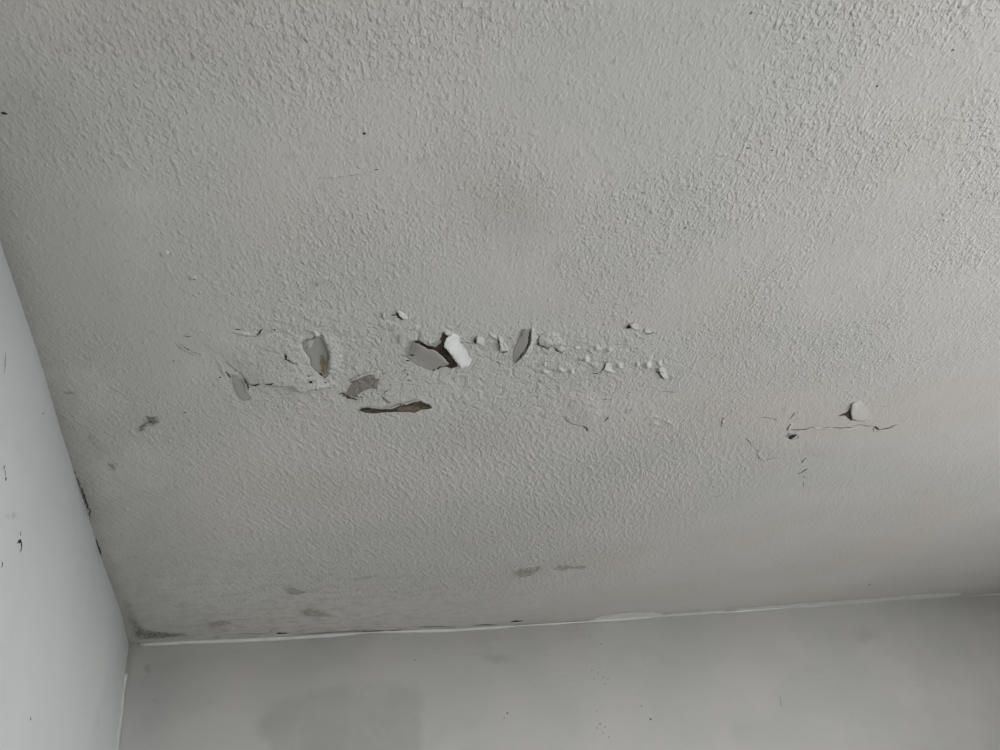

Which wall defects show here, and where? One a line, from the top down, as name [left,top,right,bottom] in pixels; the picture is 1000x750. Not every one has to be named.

peeling [201,326,538,414]
peeling [839,401,872,421]
crack [703,412,900,487]